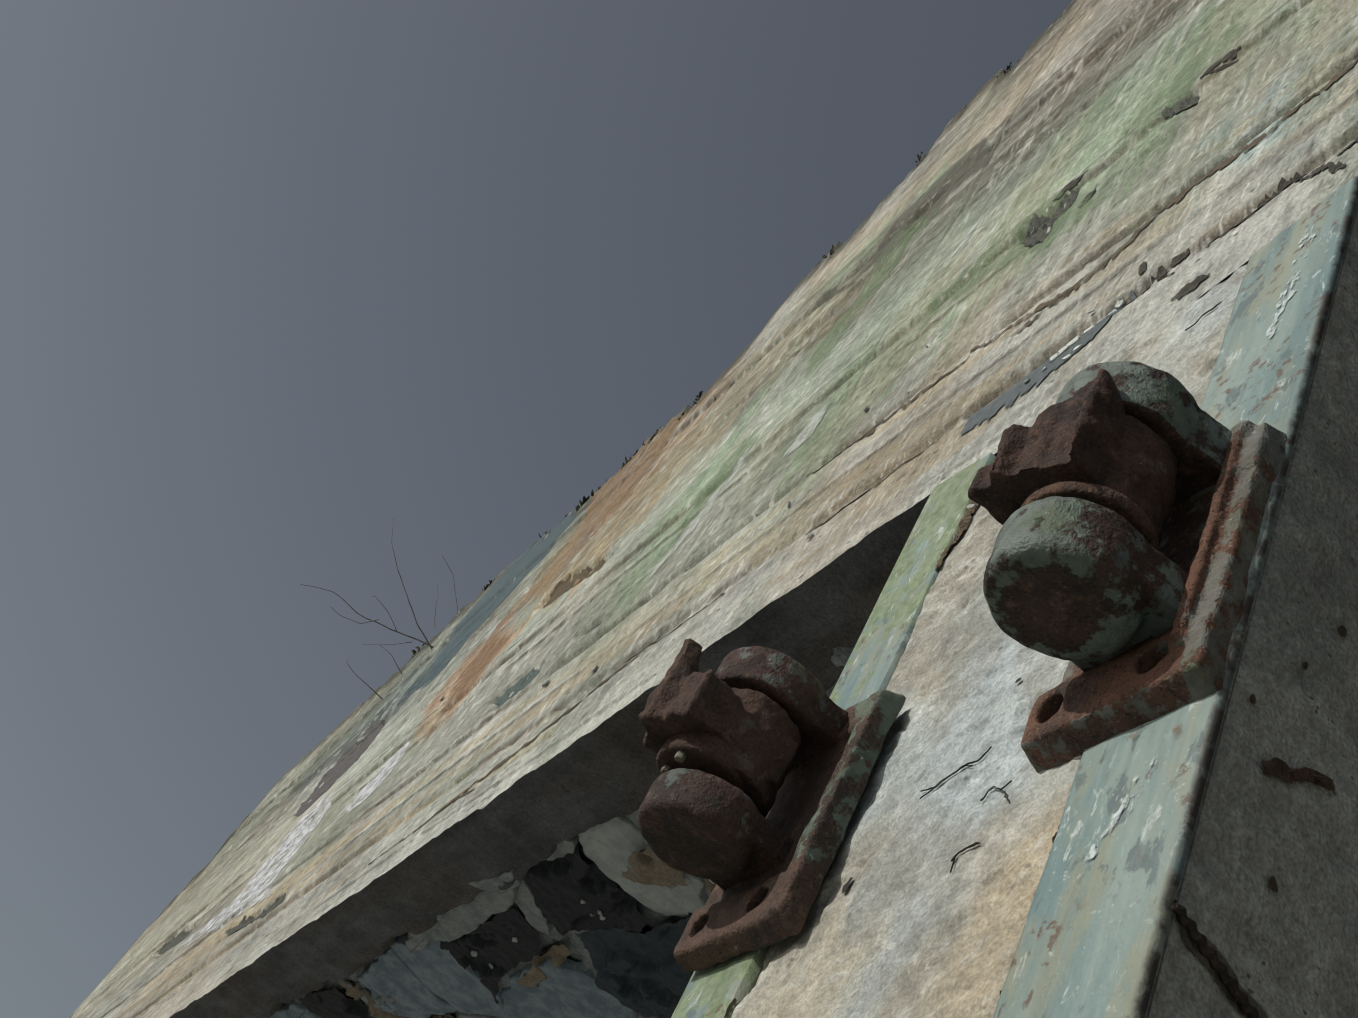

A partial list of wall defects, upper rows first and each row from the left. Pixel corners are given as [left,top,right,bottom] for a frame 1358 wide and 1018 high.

peeling [1266,227,1315,339]
spalling [295,720,385,816]
peeling [1085,776,1137,859]
spalling [225,893,286,936]
peeling [270,809,716,1018]